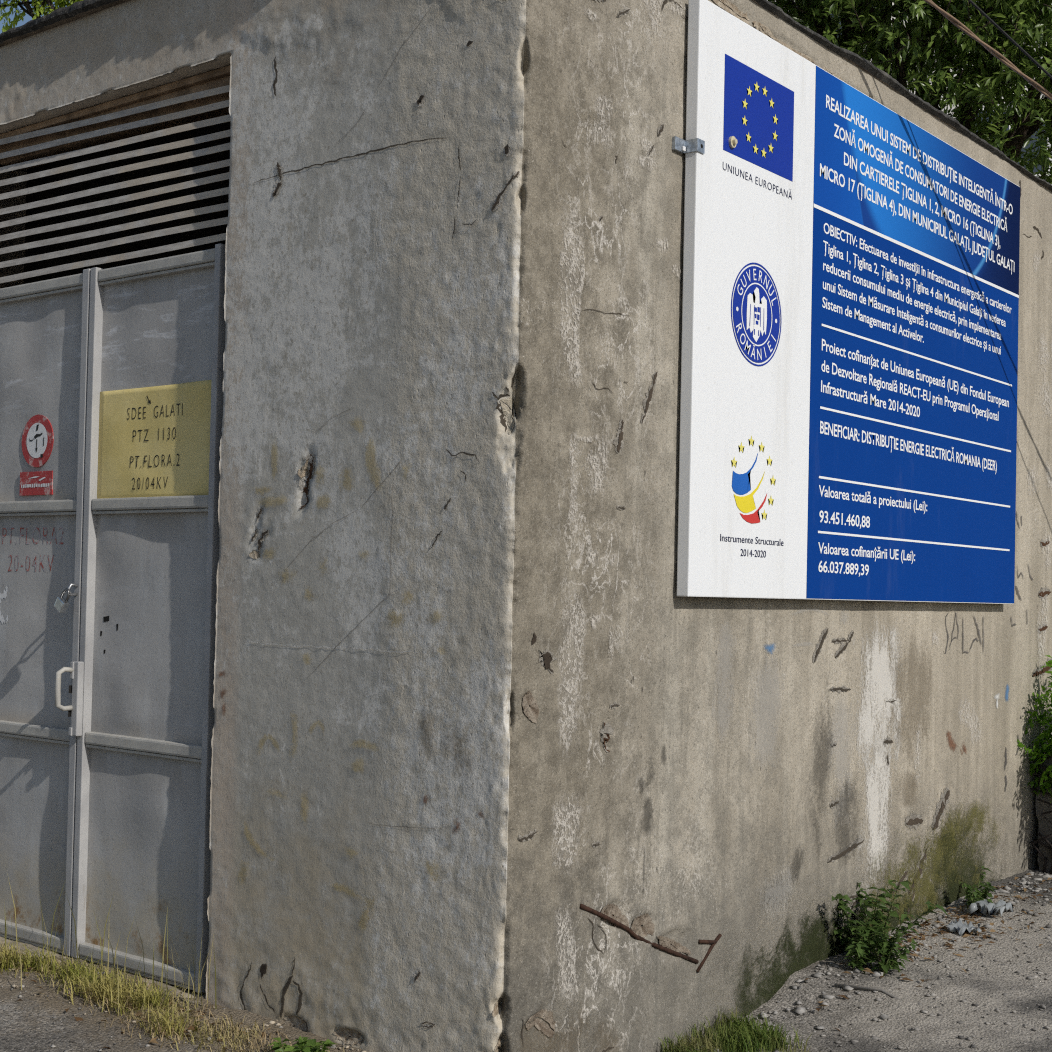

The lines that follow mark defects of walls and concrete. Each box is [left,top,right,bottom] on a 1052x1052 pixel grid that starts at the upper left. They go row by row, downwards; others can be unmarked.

crack [254,7,477,239]
spalling [492,372,516,434]
hole [298,453,316,509]
hole [249,506,268,559]
crack [288,460,404,678]
water stain [726,621,985,1017]
corrosion [579,904,722,973]